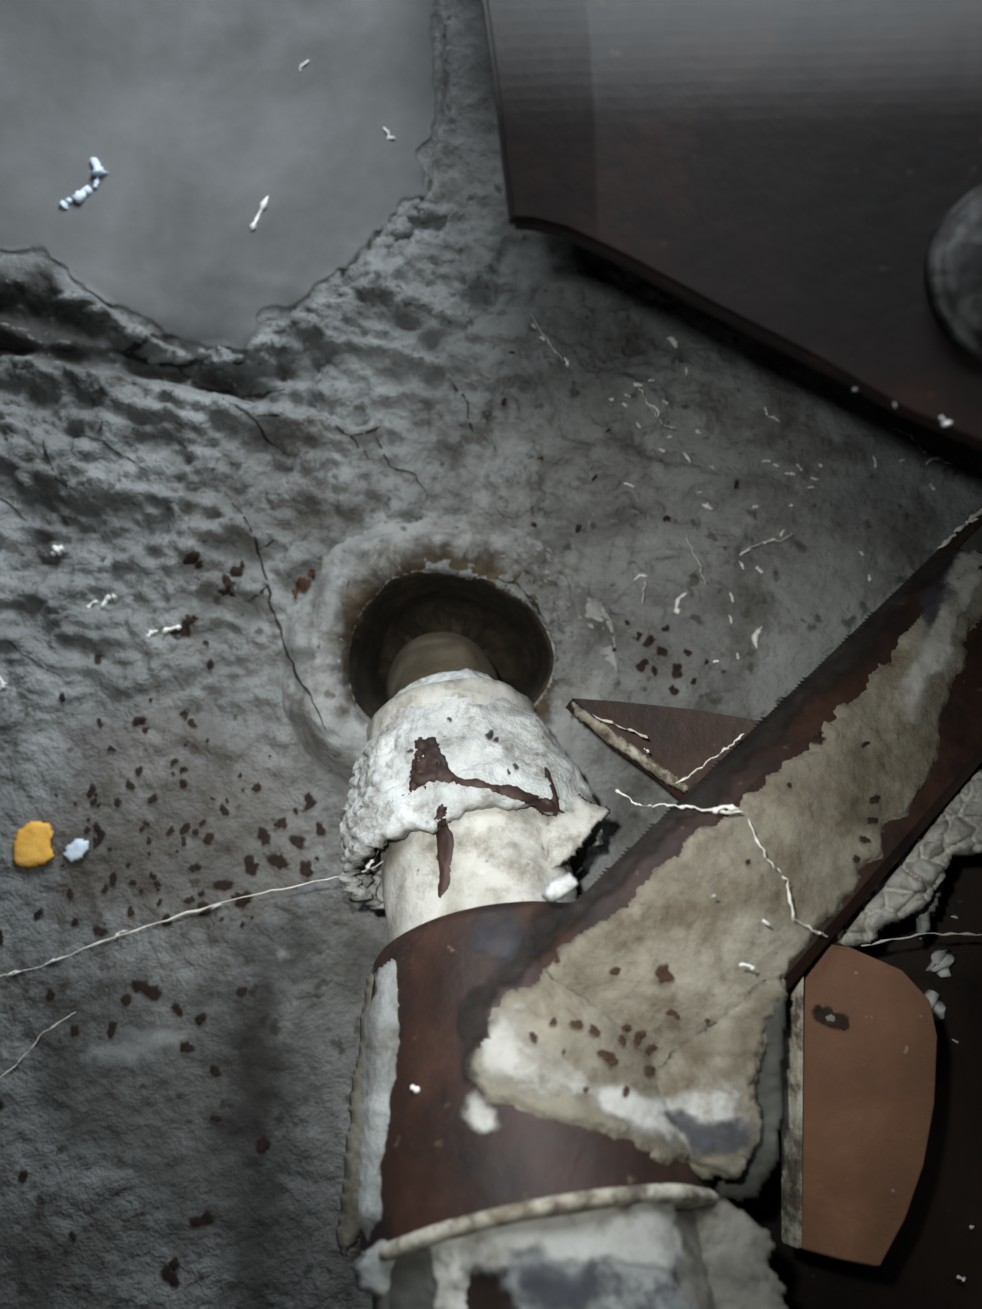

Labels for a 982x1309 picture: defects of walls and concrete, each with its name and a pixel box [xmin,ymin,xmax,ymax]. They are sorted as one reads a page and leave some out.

spalling [0,0,449,372]
crack [0,332,290,456]
crack [43,420,149,493]
crack [326,417,428,497]
crack [0,498,29,528]
corrosion [170,614,214,670]
crack [225,492,327,731]
corrosion [624,620,709,695]
corrosion [244,792,326,877]
corrosion [184,879,254,928]
corrosion [120,980,206,1025]
corrosion [549,1017,658,1075]